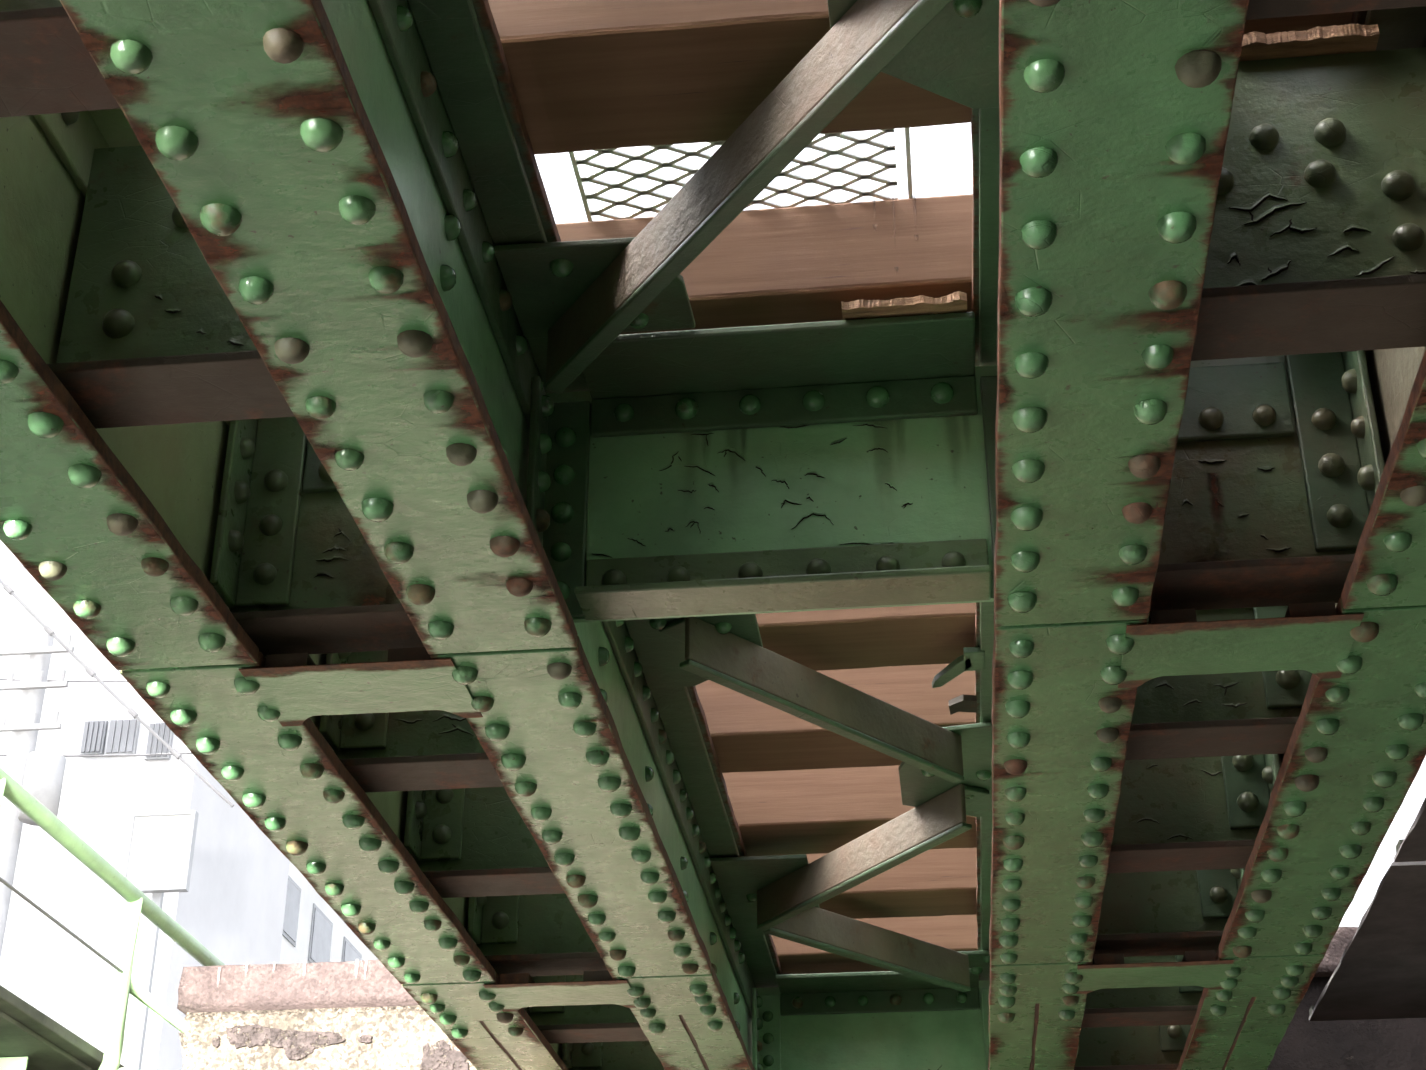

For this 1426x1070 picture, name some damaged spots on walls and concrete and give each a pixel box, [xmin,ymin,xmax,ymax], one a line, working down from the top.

rust [77,29,146,105]
rust [260,82,357,119]
rust [128,121,160,158]
rust [186,223,246,267]
rust [267,366,300,388]
rust [296,416,342,460]
rust [452,391,488,436]
rust [1402,388,1426,447]
rust [1385,468,1426,497]
rust [1096,567,1156,617]
peeling [212,1024,372,1060]
peeling [420,1039,469,1070]